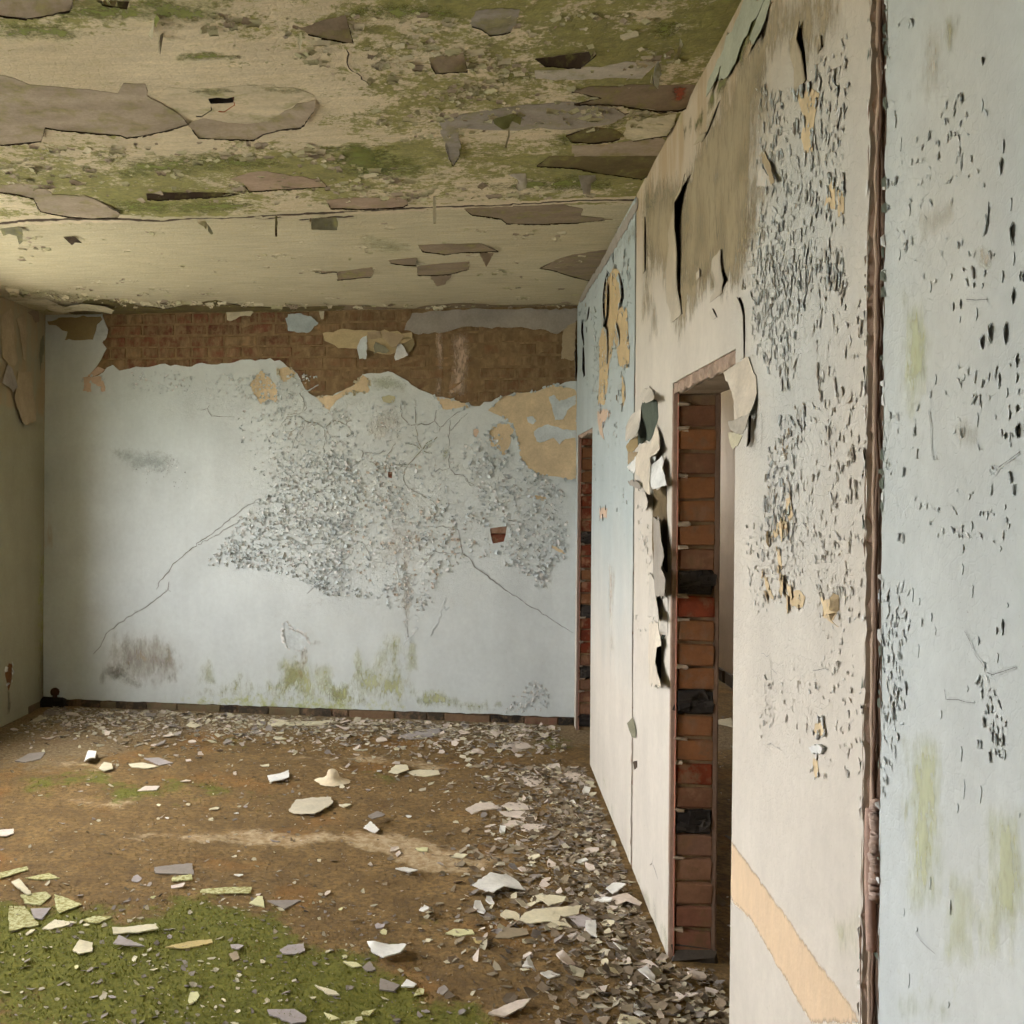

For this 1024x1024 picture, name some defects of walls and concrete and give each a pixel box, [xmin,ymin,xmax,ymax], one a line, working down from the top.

water stain [646,0,838,334]
peeling [883,93,984,188]
peeling [1001,198,1024,304]
crack [93,499,258,654]
flaking render [0,0,771,690]
crack [281,385,573,636]
peeling [674,36,867,780]
peeling [878,380,904,512]
peeling [937,471,1014,575]
peeling [957,353,1019,447]
peeling [875,574,936,809]
peeling [967,653,1006,763]